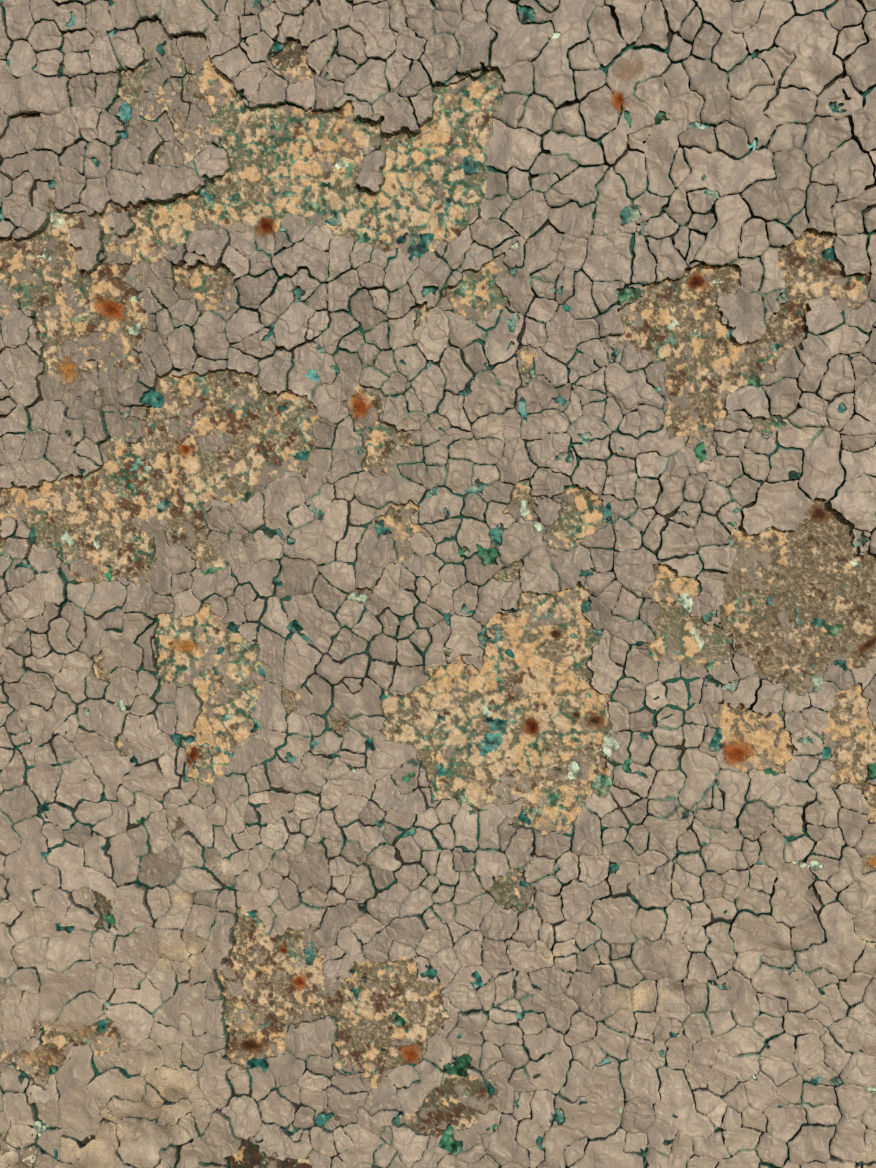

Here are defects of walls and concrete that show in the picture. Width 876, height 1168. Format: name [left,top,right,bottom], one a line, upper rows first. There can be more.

corrosion [95,298,125,321]
peeling [0,369,321,587]
peeling [0,56,505,384]
crack [232,486,478,733]
corrosion [351,393,372,417]
peeling [364,477,648,836]
crack [492,415,731,582]
crack [481,649,843,1068]
crack [487,0,876,279]
corrosion [723,740,754,765]
peeling [612,229,872,464]
peeling [634,497,876,823]